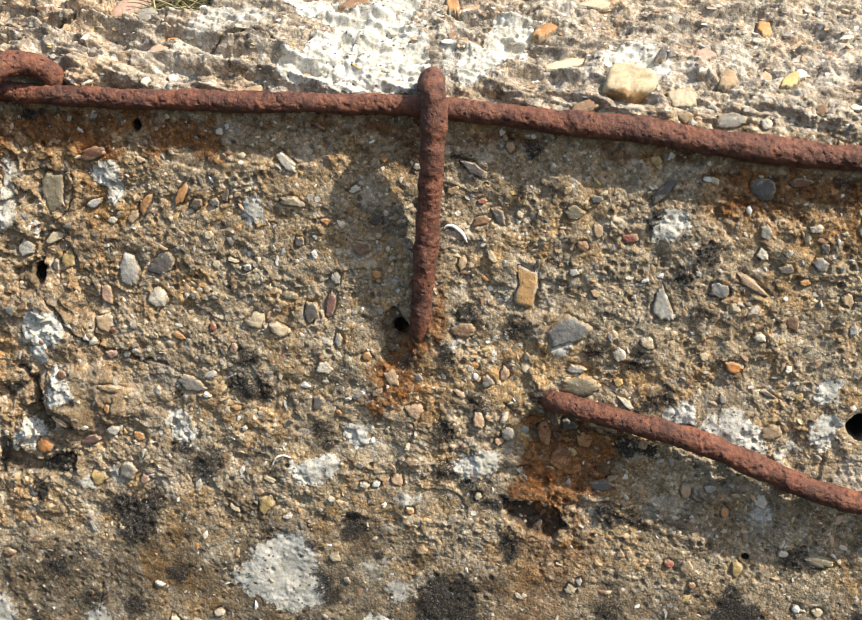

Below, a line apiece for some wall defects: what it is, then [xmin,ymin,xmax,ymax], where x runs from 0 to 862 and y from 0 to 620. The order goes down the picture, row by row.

rust [0,109,226,165]
rust [711,166,862,218]
spalling [16,256,46,292]
spalling [381,306,412,366]
rust [363,286,447,420]